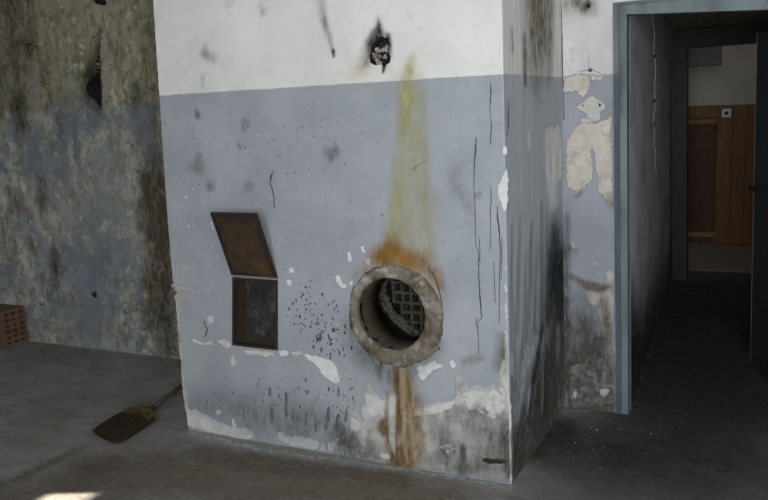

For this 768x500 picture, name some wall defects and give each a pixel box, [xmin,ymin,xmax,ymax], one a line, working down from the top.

hole [86,56,102,109]
hole [369,36,391,68]
damp [524,0,546,85]
damp [139,109,178,357]
crack [473,82,509,350]
peeling [498,169,509,213]
peeling [544,72,614,213]
peeling [244,349,341,385]
peeling [277,330,512,481]
corrosion [379,367,417,468]
damp [176,296,668,491]